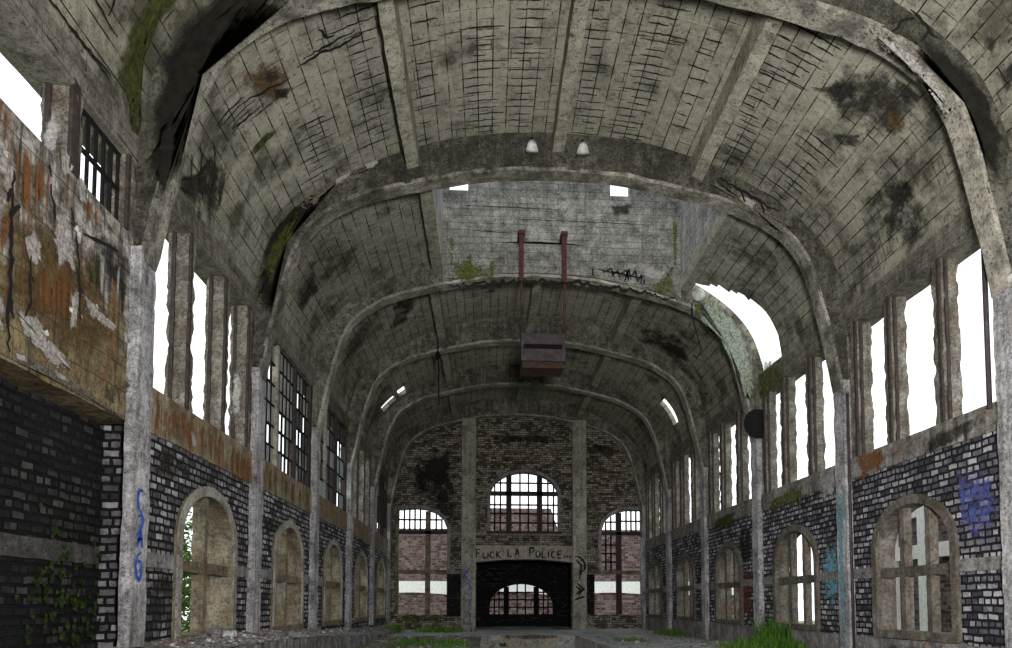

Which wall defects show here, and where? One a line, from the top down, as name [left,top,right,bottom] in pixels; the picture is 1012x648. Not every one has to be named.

leakage [151,0,280,220]
crack [179,3,394,212]
crack [409,0,550,142]
leakage [816,73,920,146]
crack [6,169,35,352]
rust [16,150,50,211]
rust [1,216,104,355]
flaking render [4,305,127,422]
flaking render [52,211,83,271]
rust [84,202,97,228]
flaking render [69,289,116,331]
leakage [260,194,326,310]